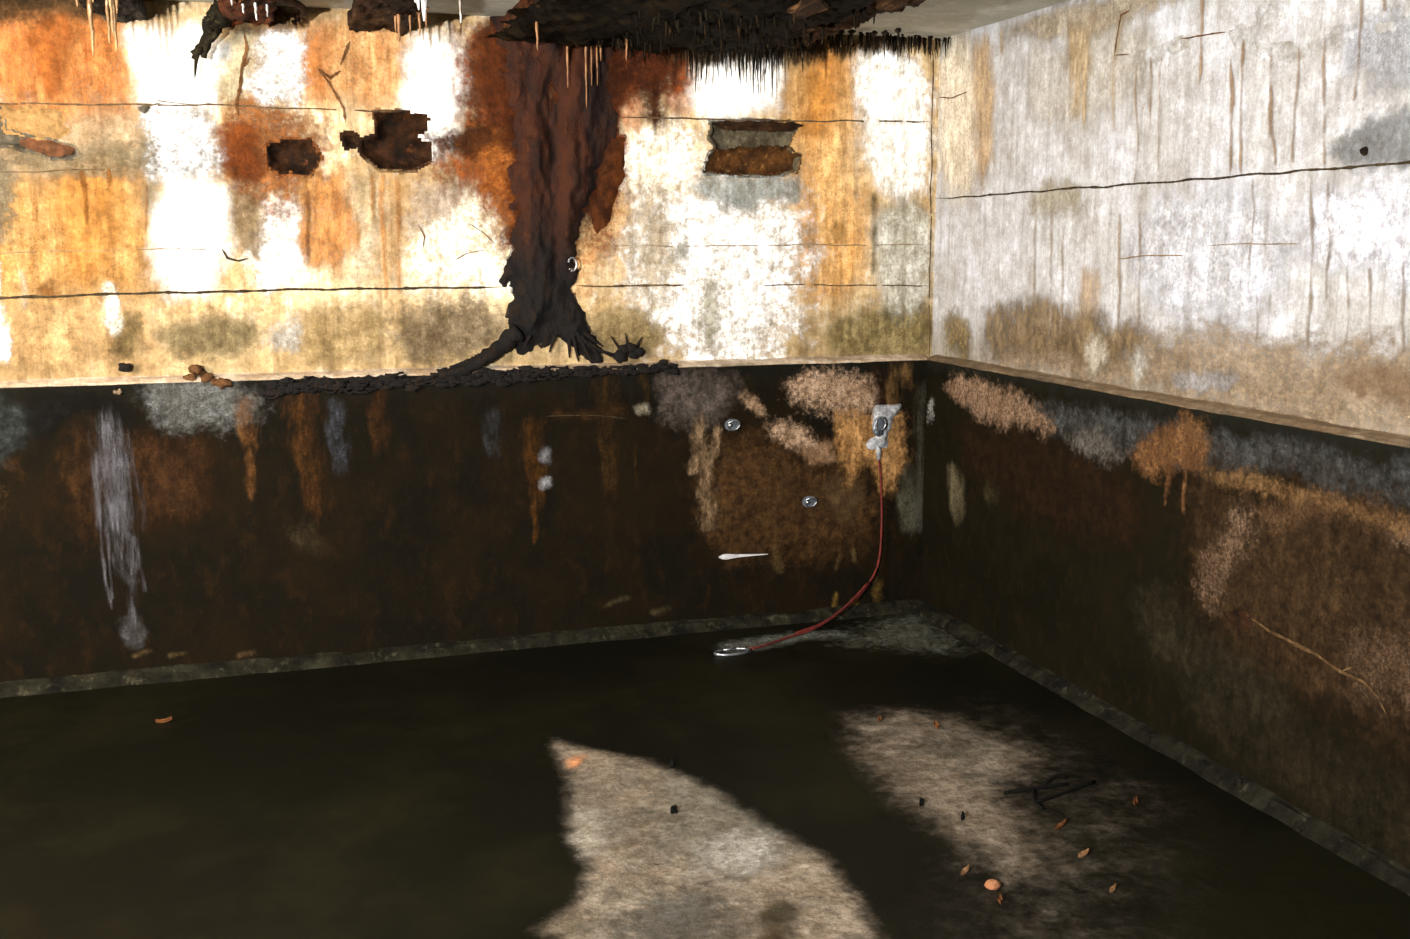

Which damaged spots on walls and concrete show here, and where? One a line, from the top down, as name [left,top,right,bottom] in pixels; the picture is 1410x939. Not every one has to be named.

rust [0,7,137,116]
water stain [0,24,510,461]
spalling [266,137,324,178]
spalling [340,107,435,175]
rust [426,16,694,380]
crack [577,281,682,289]
water stain [591,120,821,426]
spalling [701,117,803,178]
rust [782,38,870,303]
crack [617,60,1410,354]
water stain [828,28,1410,436]
crack [1180,31,1223,39]